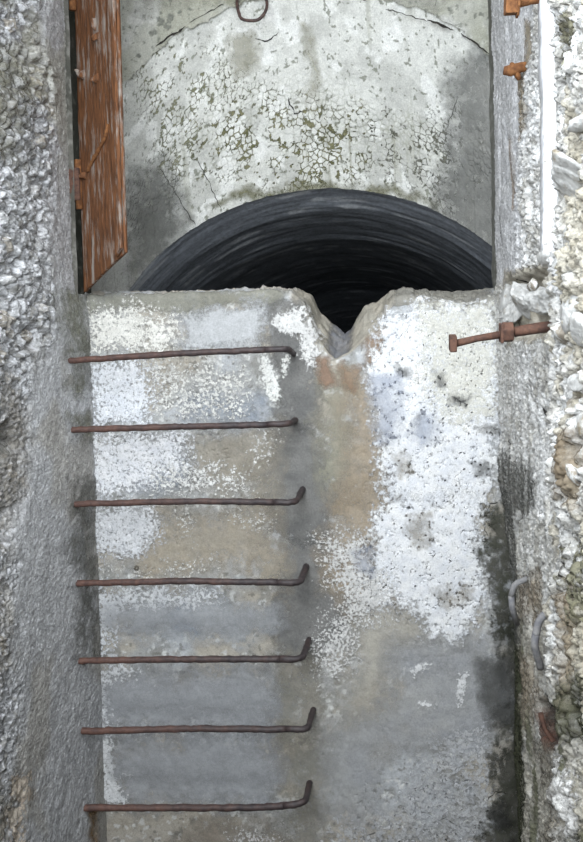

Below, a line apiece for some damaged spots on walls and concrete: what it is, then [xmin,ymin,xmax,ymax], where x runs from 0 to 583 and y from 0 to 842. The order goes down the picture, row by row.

crack [156,4,223,46]
spalling [550,149,583,198]
spalling [567,115,583,133]
damp [373,370,407,433]
damp [66,289,350,842]
peeling [87,264,583,842]
damp [350,602,422,727]
damp [473,462,529,842]